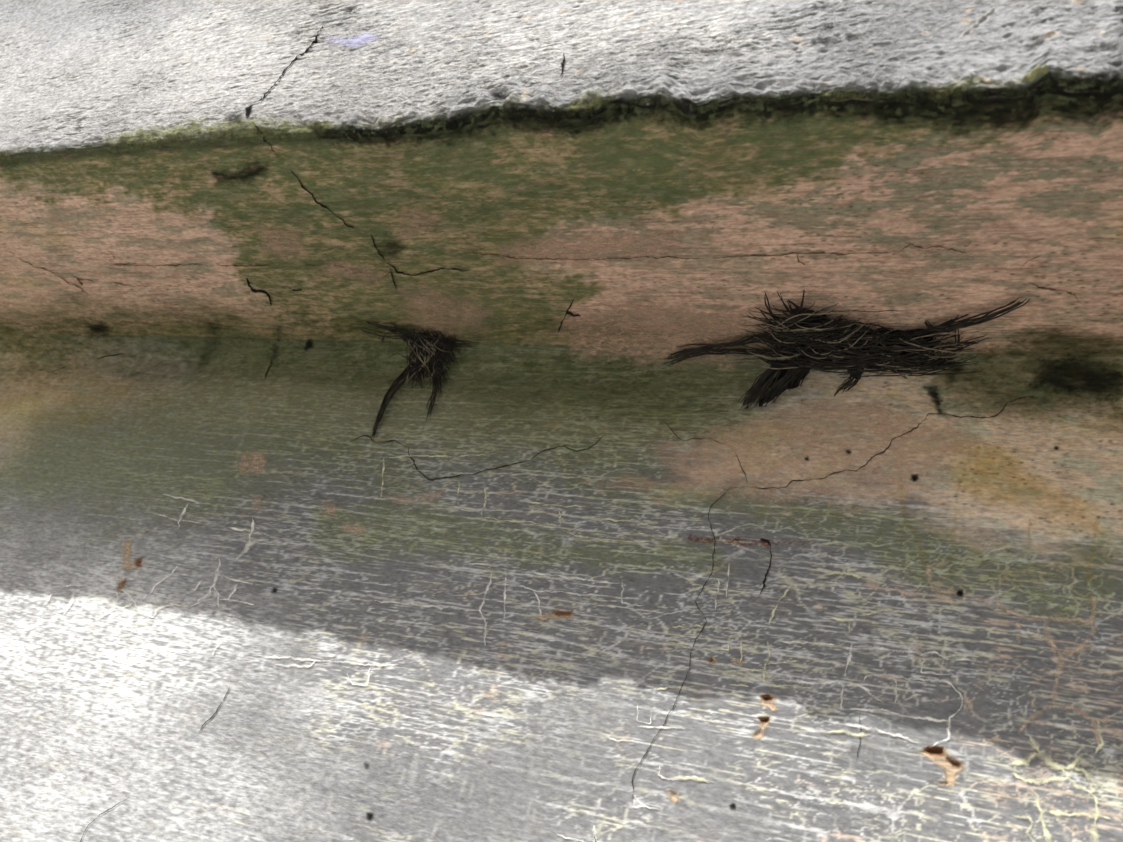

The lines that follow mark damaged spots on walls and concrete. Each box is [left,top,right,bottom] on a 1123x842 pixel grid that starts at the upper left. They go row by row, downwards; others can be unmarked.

crack [354,435,603,480]
crack [632,396,1033,797]